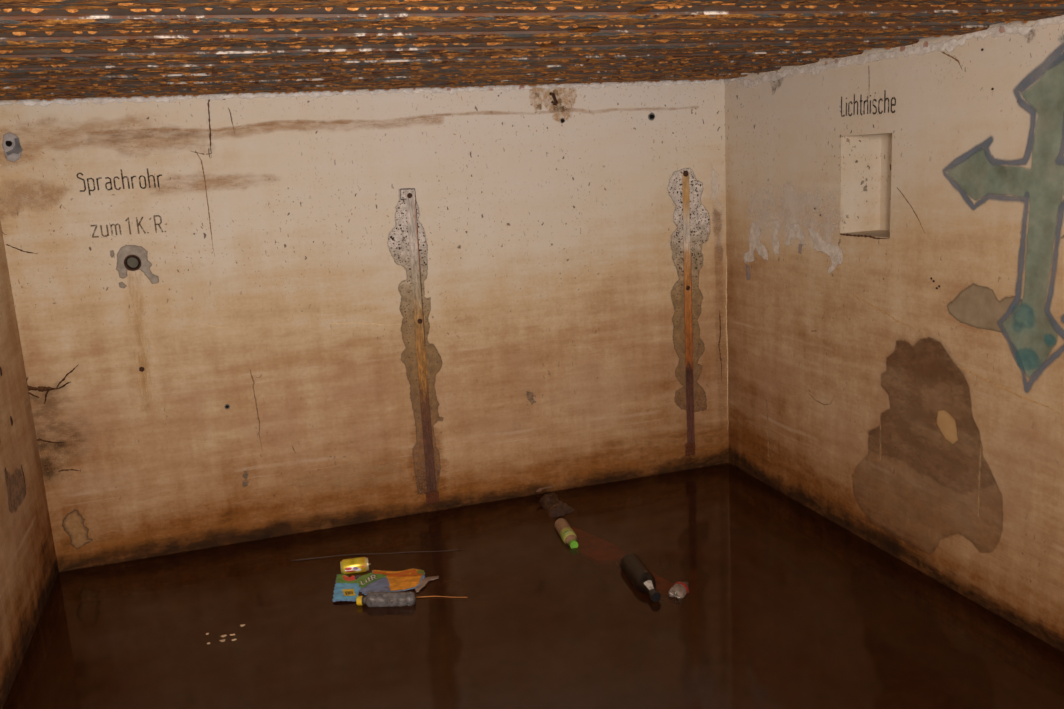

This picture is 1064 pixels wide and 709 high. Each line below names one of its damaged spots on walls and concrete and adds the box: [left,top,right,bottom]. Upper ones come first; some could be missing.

rust [0,0,1064,121]
spalling [388,189,443,494]
spalling [668,168,710,412]
peeling [743,220,843,280]
leakage [936,410,958,444]